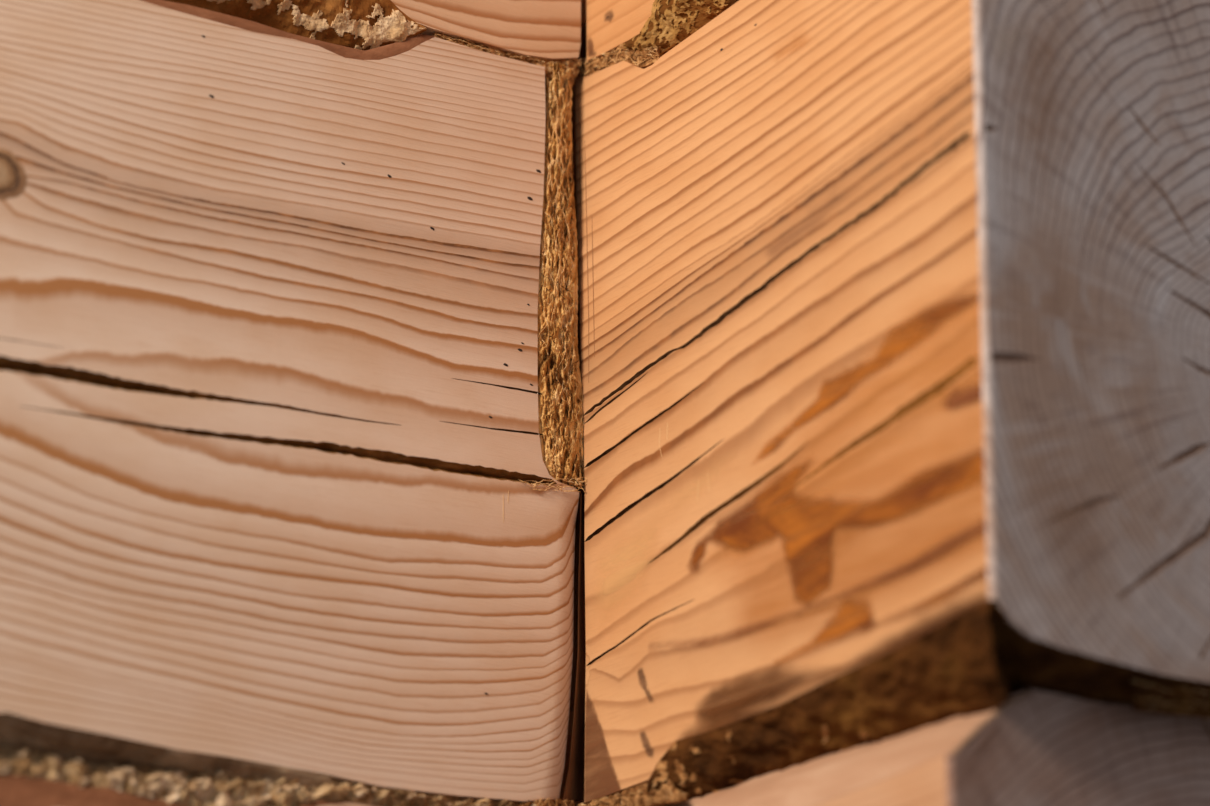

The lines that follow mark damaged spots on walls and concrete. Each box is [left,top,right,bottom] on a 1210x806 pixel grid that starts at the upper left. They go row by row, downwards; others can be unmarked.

crack [583,125,998,424]
crack [1138,166,1210,318]
crack [0,337,557,486]
crack [584,383,703,468]
crack [585,440,722,542]
crack [648,351,1041,564]
crack [1045,496,1119,524]
crack [1116,520,1210,599]
crack [1157,442,1210,470]
crack [1181,357,1210,375]